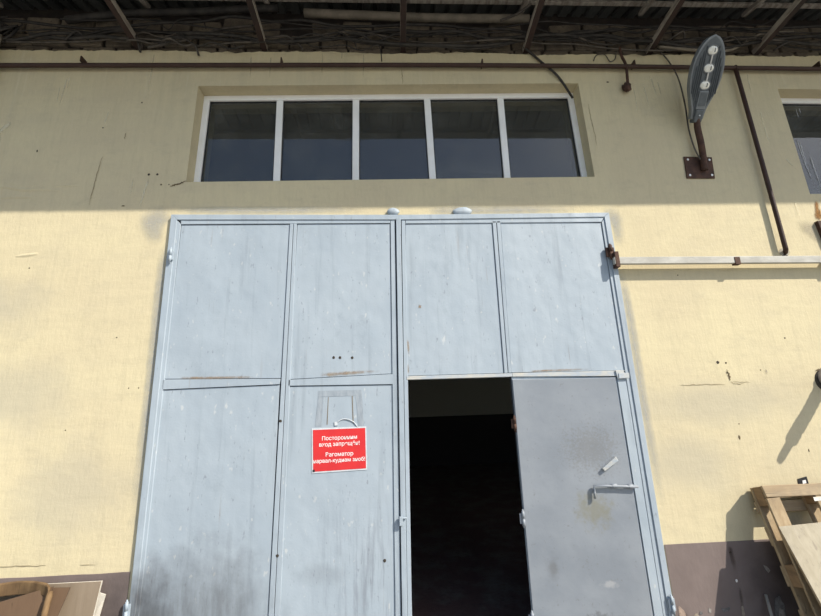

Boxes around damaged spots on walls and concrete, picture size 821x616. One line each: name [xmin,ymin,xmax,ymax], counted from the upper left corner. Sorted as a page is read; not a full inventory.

crack [685,370,744,386]